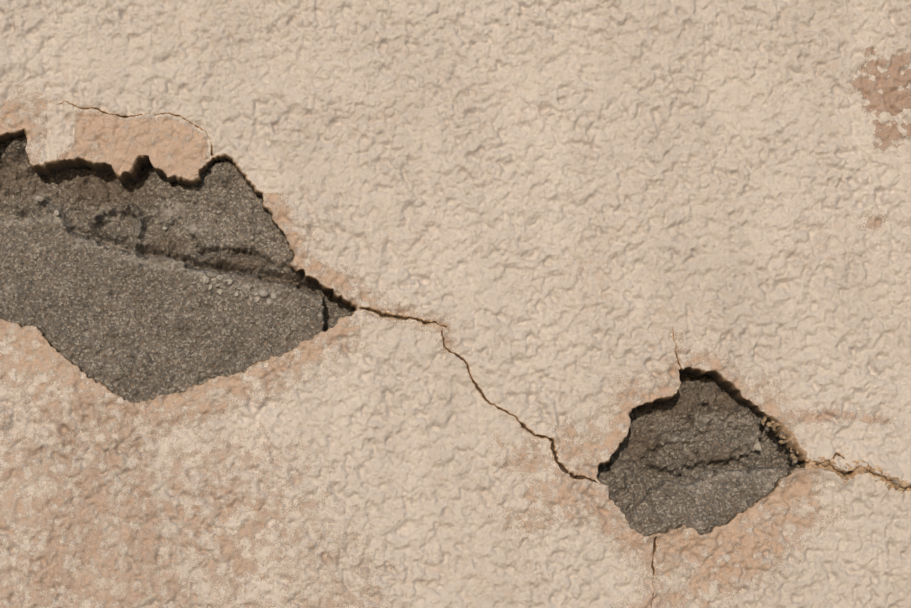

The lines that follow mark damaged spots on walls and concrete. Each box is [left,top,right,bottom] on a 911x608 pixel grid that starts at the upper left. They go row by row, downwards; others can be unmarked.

spalling [0,111,359,404]
crack [359,302,597,483]
spalling [595,366,812,538]
crack [804,451,911,494]